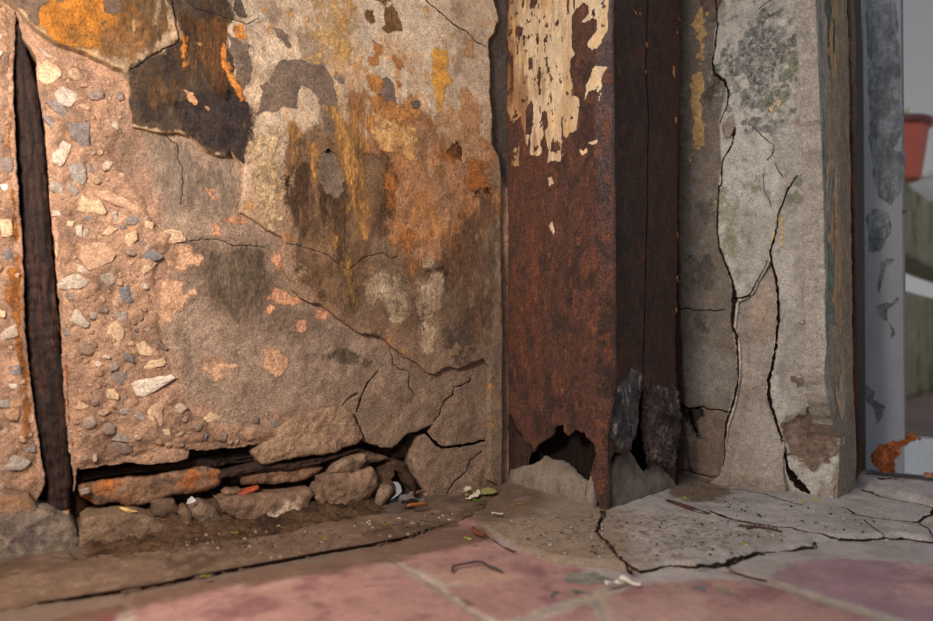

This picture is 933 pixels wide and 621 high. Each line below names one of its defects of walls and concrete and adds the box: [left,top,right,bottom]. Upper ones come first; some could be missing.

corrosion [37,0,170,63]
crack [426,0,486,47]
damp [128,0,500,367]
corrosion [326,39,502,286]
peeling [864,0,906,338]
peeling [0,0,503,519]
crack [679,0,810,505]
crack [342,347,415,438]
crack [422,378,486,493]
spalling [780,406,840,471]
corrosion [870,433,921,474]
crack [595,489,933,582]